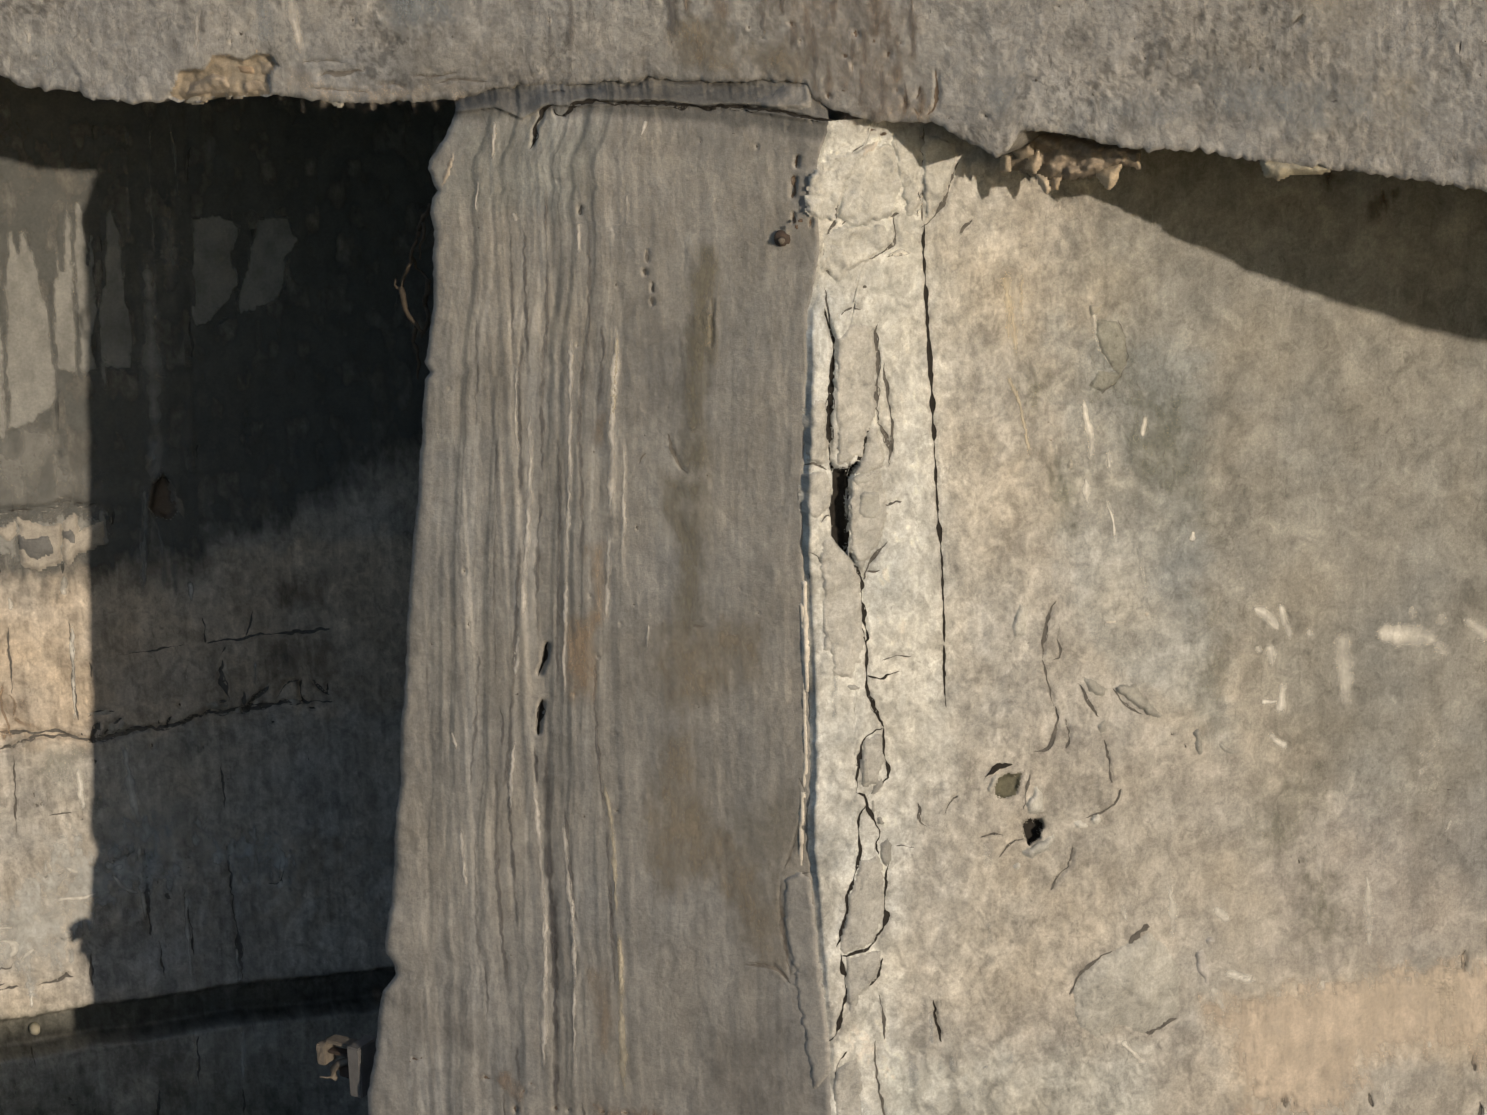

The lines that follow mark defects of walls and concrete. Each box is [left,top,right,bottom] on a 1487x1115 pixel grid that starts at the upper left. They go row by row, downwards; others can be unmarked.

spalling [170,32,276,103]
crack [517,76,863,152]
spalling [999,133,1141,194]
crack [643,250,654,306]
damp [0,75,456,597]
crack [708,298,716,349]
crack [639,434,689,474]
peeling [0,513,105,572]
crack [791,71,972,1115]
crack [981,832,1024,857]
crack [745,825,809,984]